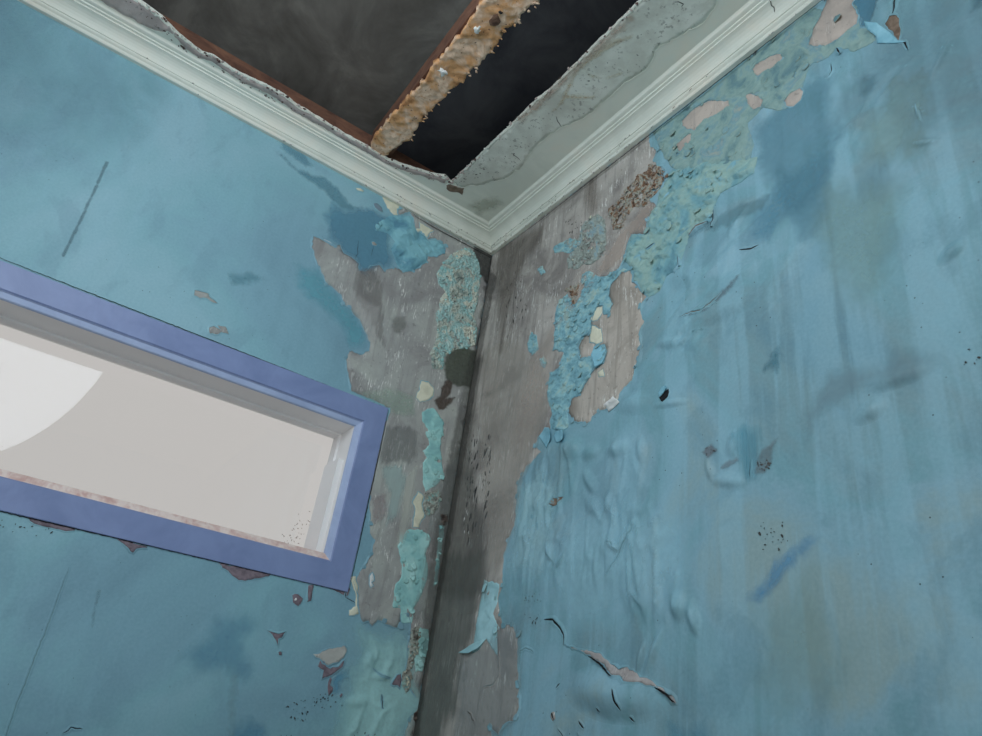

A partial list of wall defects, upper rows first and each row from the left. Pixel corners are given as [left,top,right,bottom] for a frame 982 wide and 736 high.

peeling [752,53,784,77]
peeling [100,0,718,196]
peeling [676,100,729,151]
water stain [474,241,525,284]
peeling [310,134,665,736]
peeling [291,585,314,608]